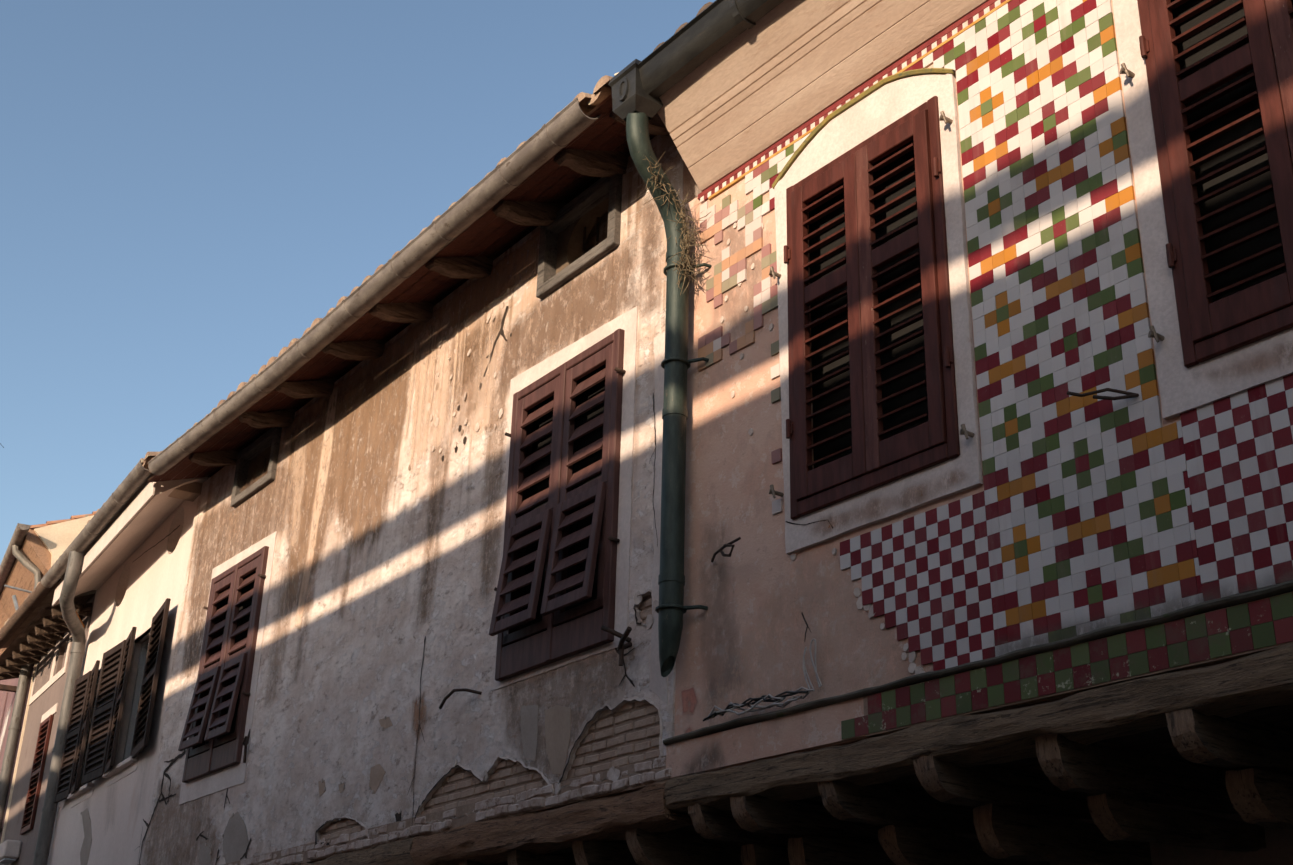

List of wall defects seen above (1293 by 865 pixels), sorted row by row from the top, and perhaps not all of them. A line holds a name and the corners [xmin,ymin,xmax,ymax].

leakage [184,203,658,672]
spalling [395,696,663,825]